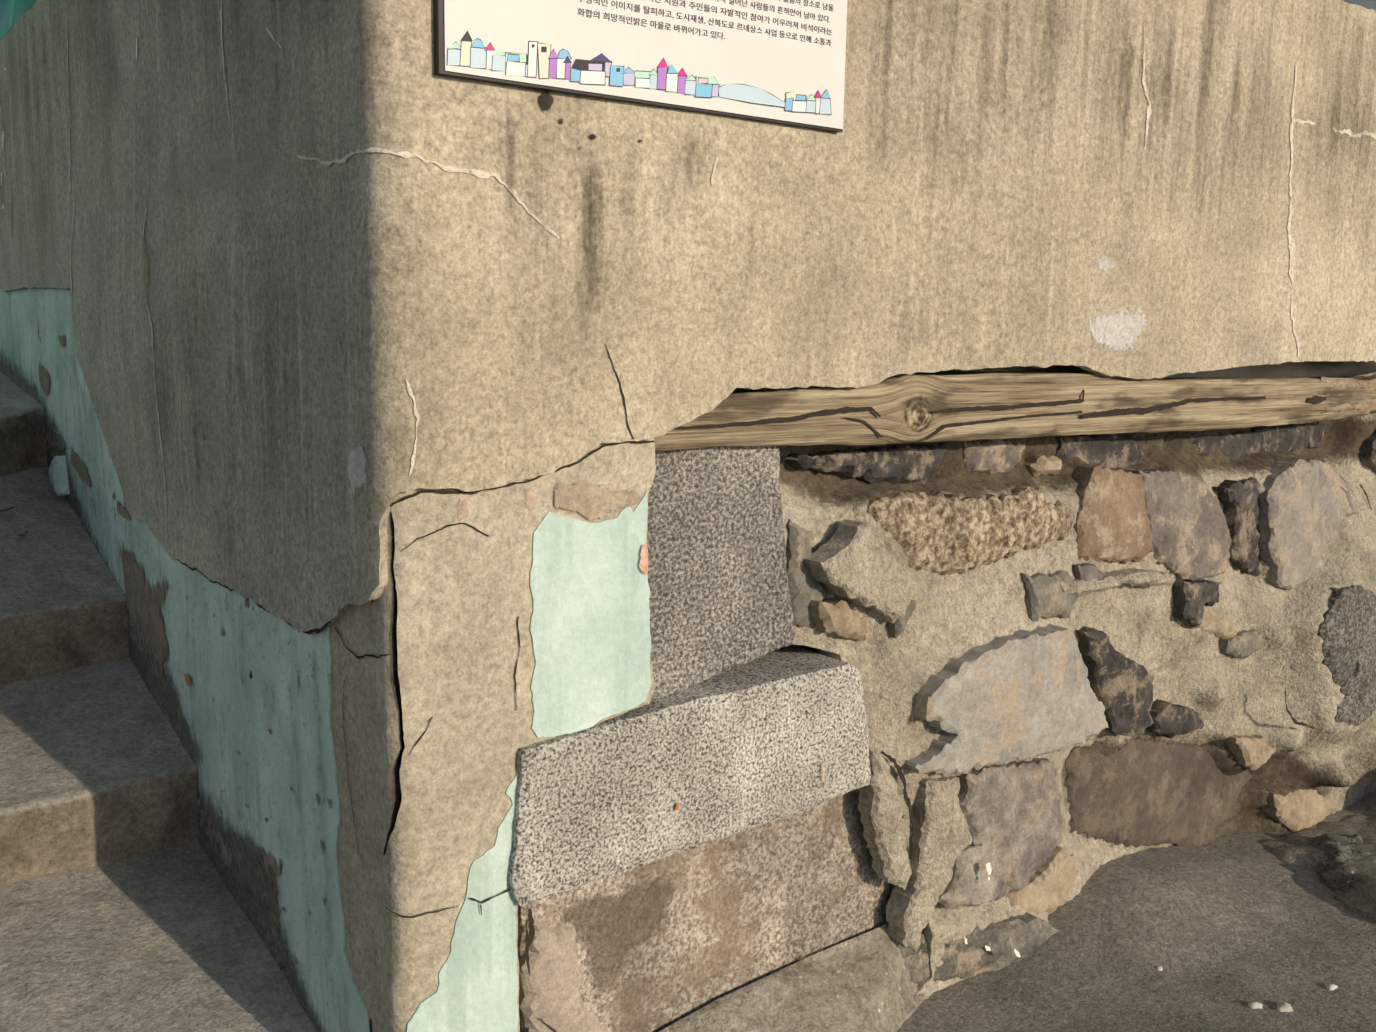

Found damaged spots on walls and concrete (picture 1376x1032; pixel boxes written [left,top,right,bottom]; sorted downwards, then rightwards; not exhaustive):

crack [297,147,559,239]
crack [1287,65,1376,357]
peeling [33,363,50,401]
peeling [45,431,91,487]
peeling [112,493,131,520]
peeling [120,544,169,688]
crack [145,290,654,856]